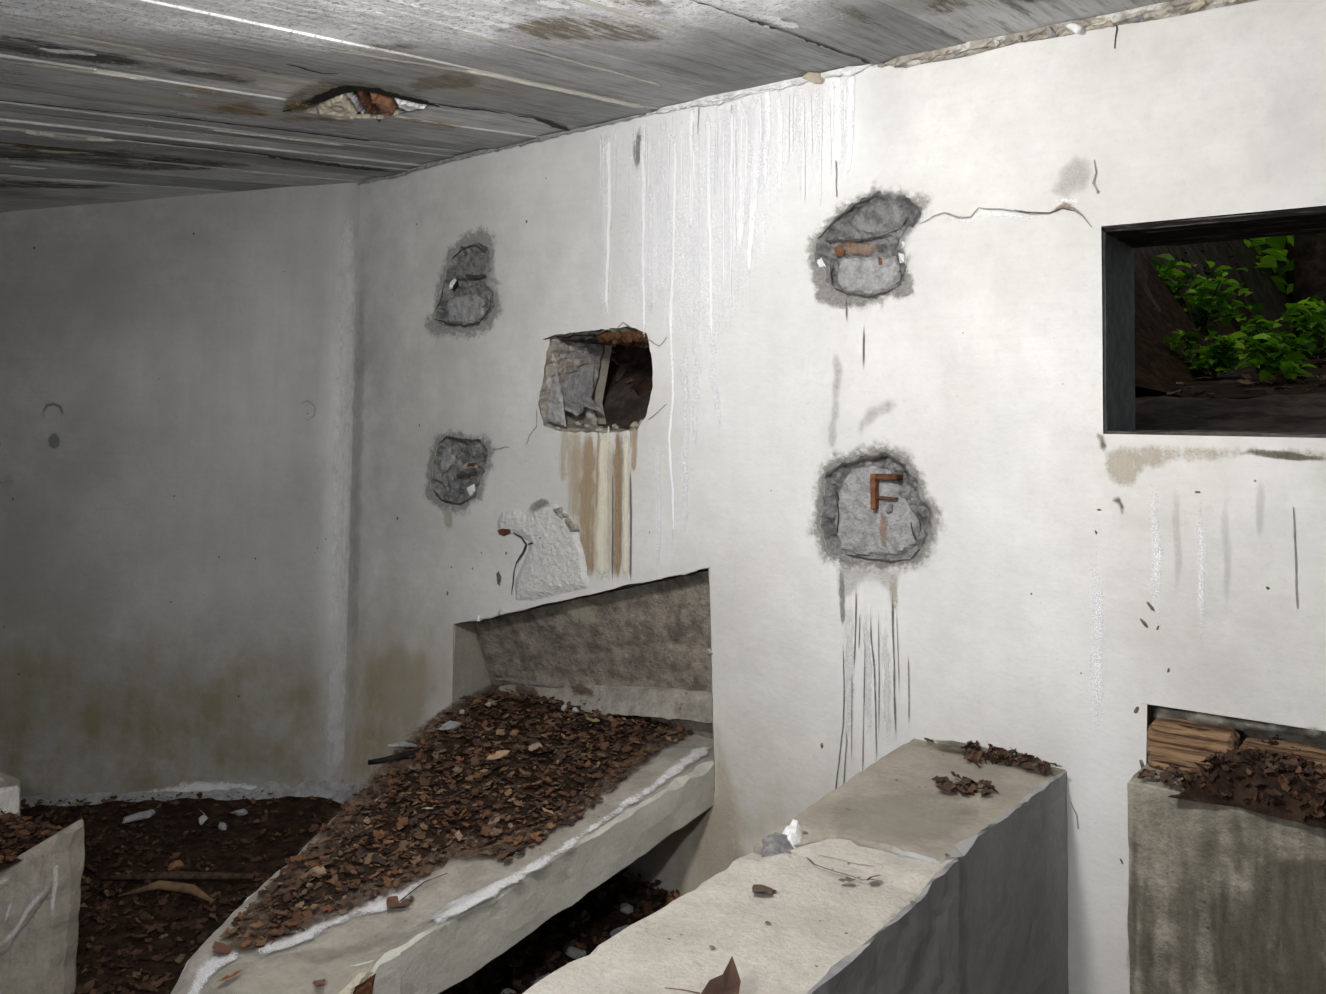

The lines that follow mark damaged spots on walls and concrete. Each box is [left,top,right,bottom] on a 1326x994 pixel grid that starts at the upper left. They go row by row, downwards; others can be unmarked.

leakage [455,0,673,85]
leakage [0,111,340,189]
spalling [280,82,455,128]
leakage [331,44,878,562]
spalling [808,188,928,318]
crack [919,160,1100,227]
spalling [526,322,667,445]
spalling [426,432,509,526]
rust [561,426,637,577]
spalling [811,446,940,569]
leakage [1251,450,1322,460]
leakage [835,574,909,789]